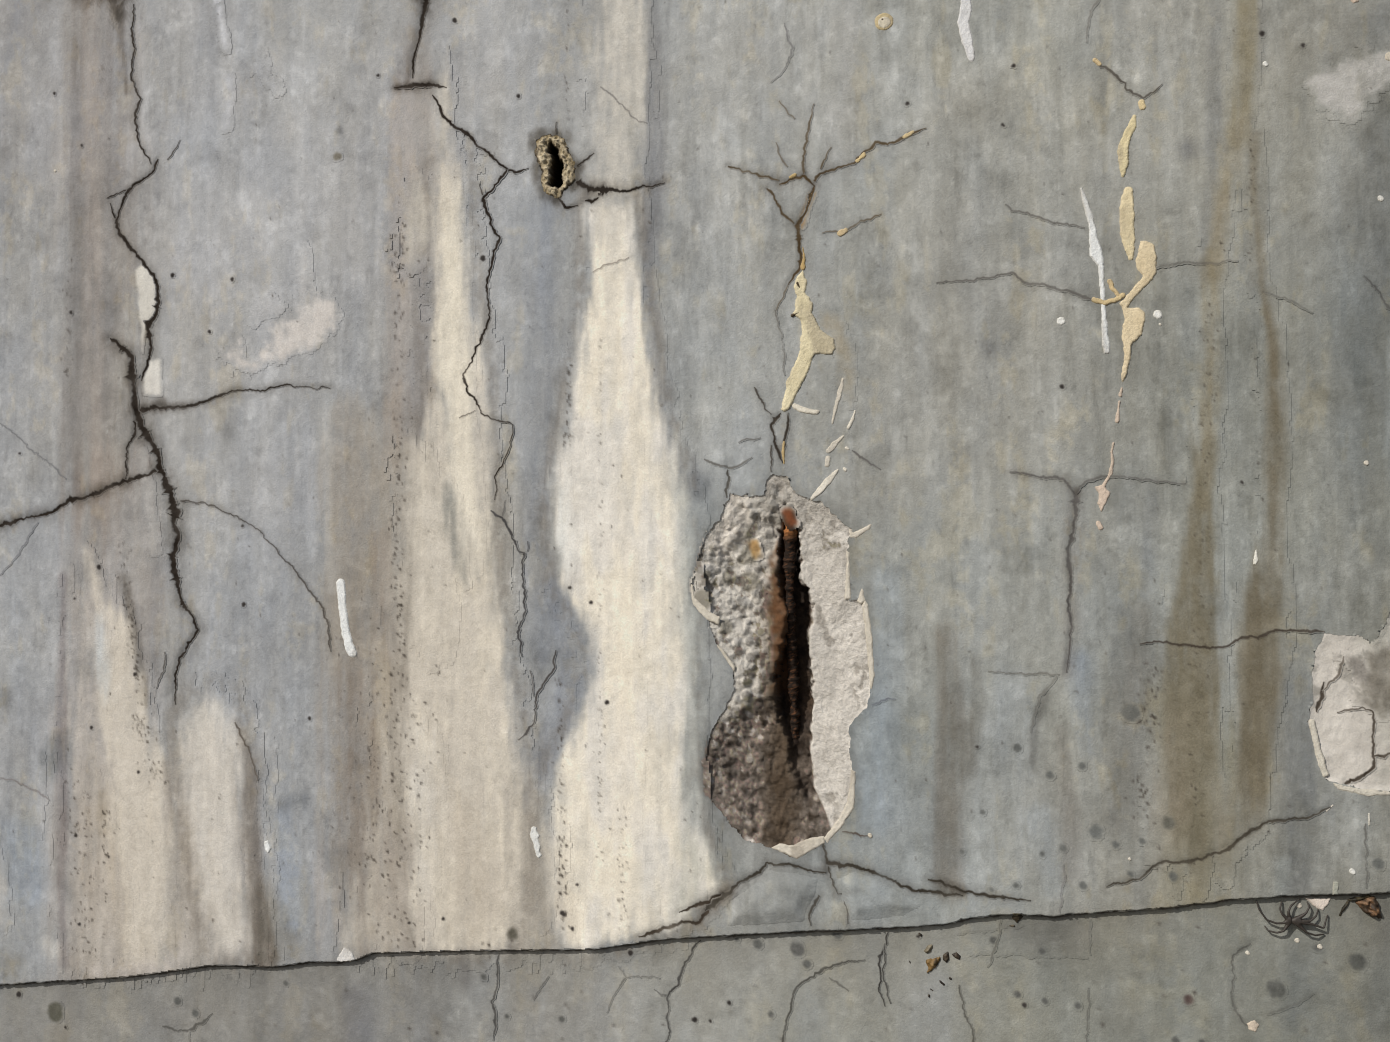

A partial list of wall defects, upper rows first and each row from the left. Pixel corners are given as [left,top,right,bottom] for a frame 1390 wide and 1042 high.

water stain [36,540,290,1019]
crack [0,4,332,705]
crack [394,0,557,740]
water stain [329,0,738,982]
crack [592,257,629,273]
crack [558,152,665,210]
crack [0,806,1390,1042]
corrosion [745,505,800,700]
spalling [691,474,875,859]
crack [704,23,927,498]
peeling [1301,40,1390,125]
peeling [1308,612,1390,812]